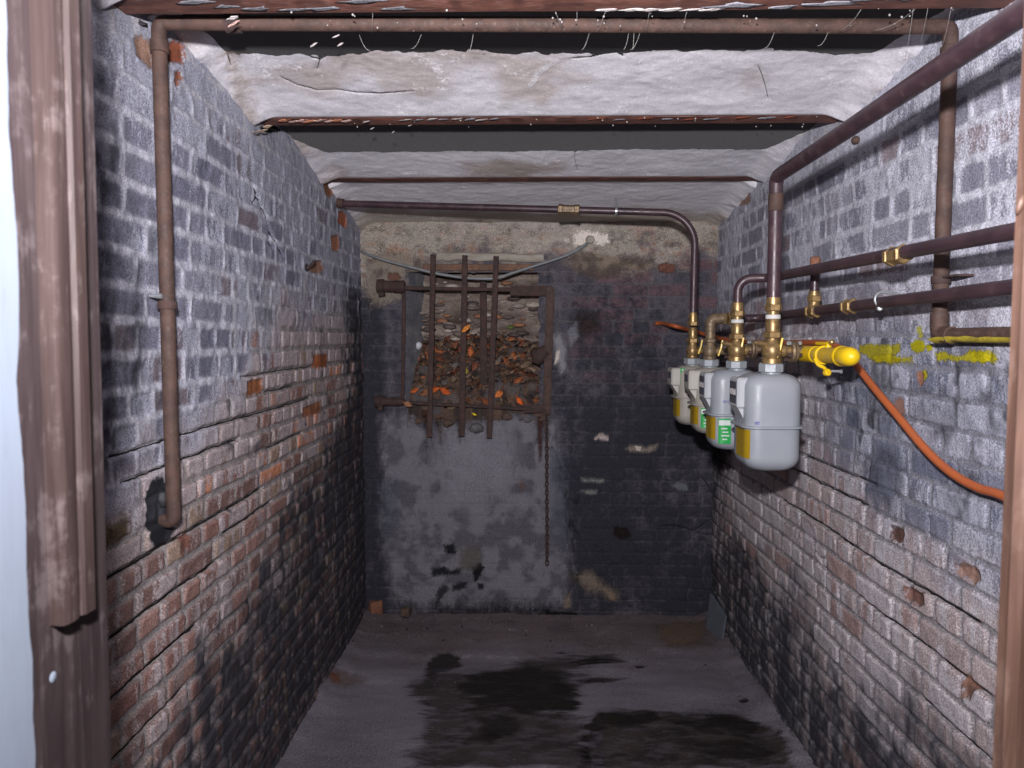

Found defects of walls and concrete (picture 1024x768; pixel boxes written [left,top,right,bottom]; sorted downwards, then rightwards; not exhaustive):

crack [108,366,309,483]
crack [107,488,268,580]
spalling [889,525,905,545]
water stain [573,572,615,600]
spalling [903,586,925,606]
spalling [955,562,981,585]
spalling [961,672,982,701]
water stain [408,653,793,768]